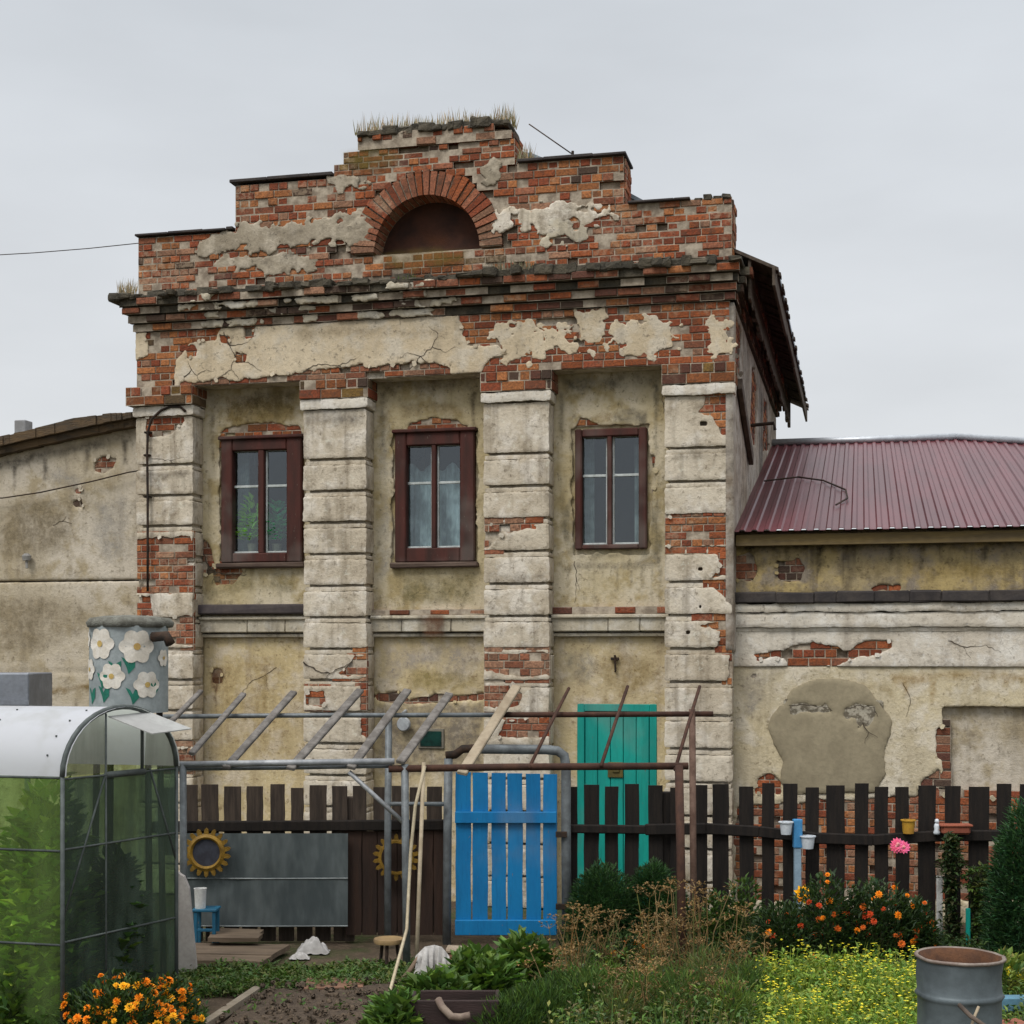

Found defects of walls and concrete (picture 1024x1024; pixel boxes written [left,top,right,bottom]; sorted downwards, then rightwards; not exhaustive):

crack [184,332,262,383]
flaking render [137,328,452,387]
crack [401,330,454,370]
flaking render [459,301,770,451]
flaking render [137,530,246,651]
flaking render [665,512,757,598]
crack [303,661,353,678]
flaking render [304,645,550,745]
flaking render [691,613,733,685]
flaking render [754,639,892,666]
flaking render [753,773,783,902]
flaking render [909,719,969,901]